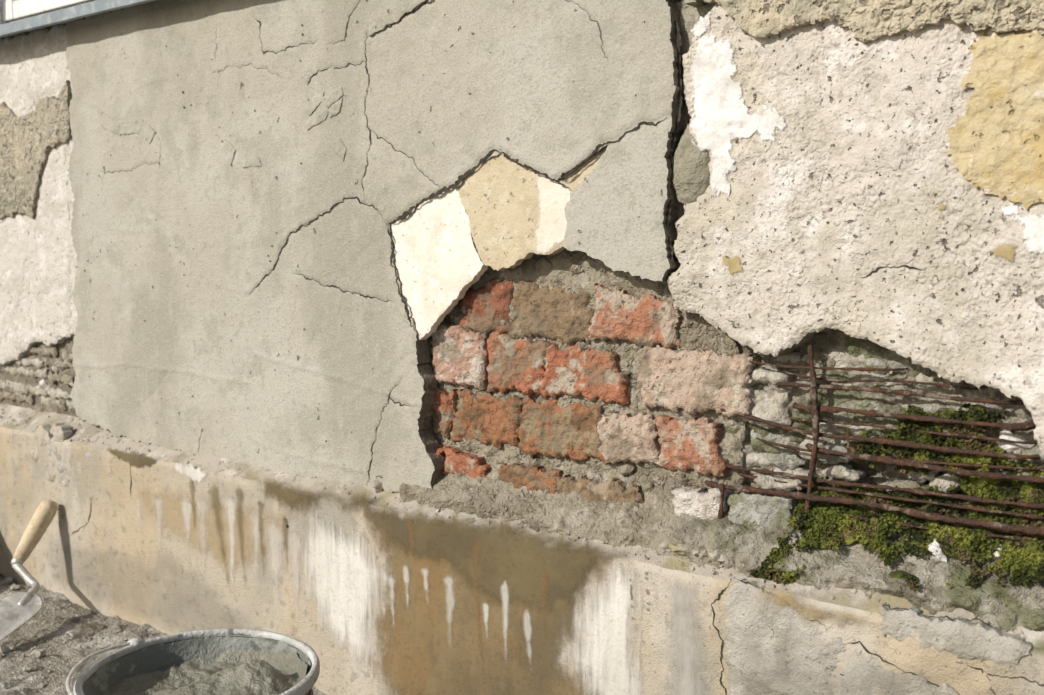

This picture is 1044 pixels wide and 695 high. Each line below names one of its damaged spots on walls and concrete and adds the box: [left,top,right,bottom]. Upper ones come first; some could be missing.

peeling [3,60,68,111]
peeling [0,145,85,341]
crack [214,0,683,334]
peeling [947,27,1044,211]
crack [367,380,411,484]
flaking render [391,148,799,569]
corrosion [705,345,1044,544]
water stain [103,649,314,695]
water stain [138,464,648,695]
crack [711,577,940,695]
crack [880,605,1001,629]
crack [956,662,1044,695]